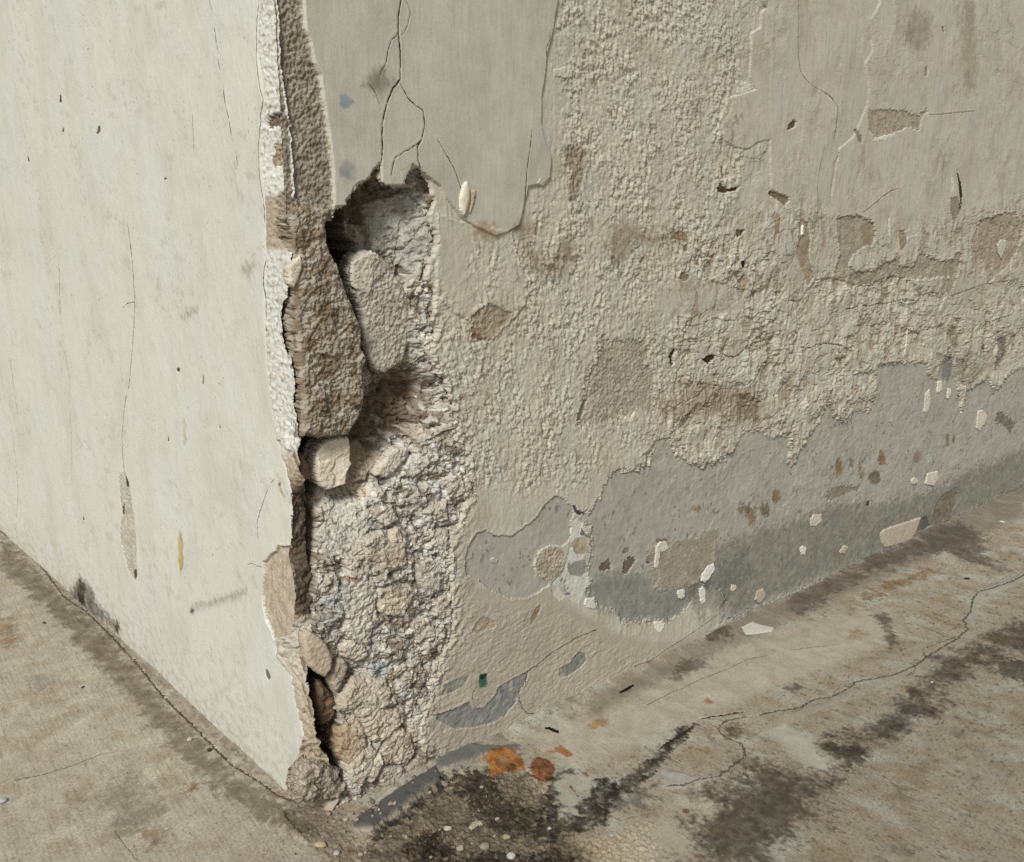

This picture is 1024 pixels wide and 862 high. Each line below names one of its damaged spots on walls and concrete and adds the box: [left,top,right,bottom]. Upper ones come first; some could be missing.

crack [371,0,461,188]
peeling [262,0,1024,809]
damp [73,579,119,632]
peeling [119,472,137,580]
rust [484,747,573,782]
damp [371,723,699,862]
crack [647,574,1024,786]
damp [677,618,1024,862]